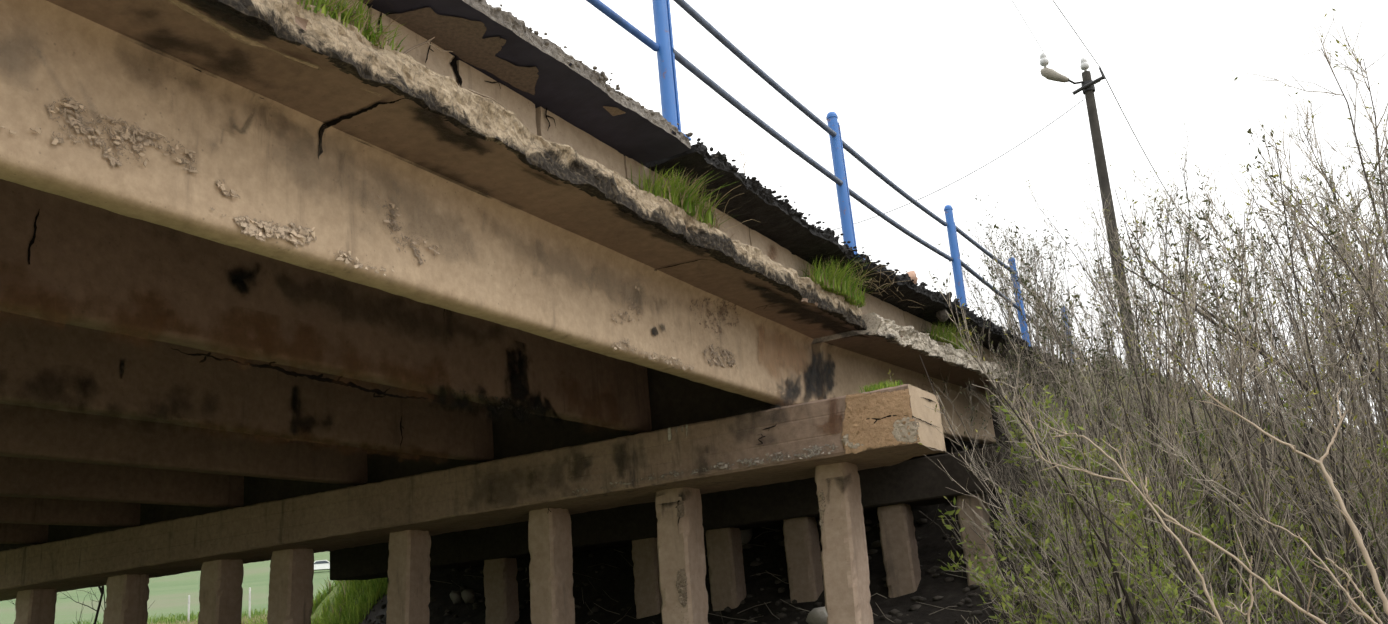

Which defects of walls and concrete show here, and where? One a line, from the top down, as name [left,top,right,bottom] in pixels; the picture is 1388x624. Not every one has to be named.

peeling [386,7,539,95]
spalling [1,97,198,173]
crack [318,98,405,159]
crack [28,209,40,264]
water stain [229,264,259,292]
spalling [210,179,317,248]
spalling [334,250,395,276]
crack [171,348,440,449]
water stain [426,341,562,425]
water stain [782,352,835,404]
spalling [574,388,920,496]